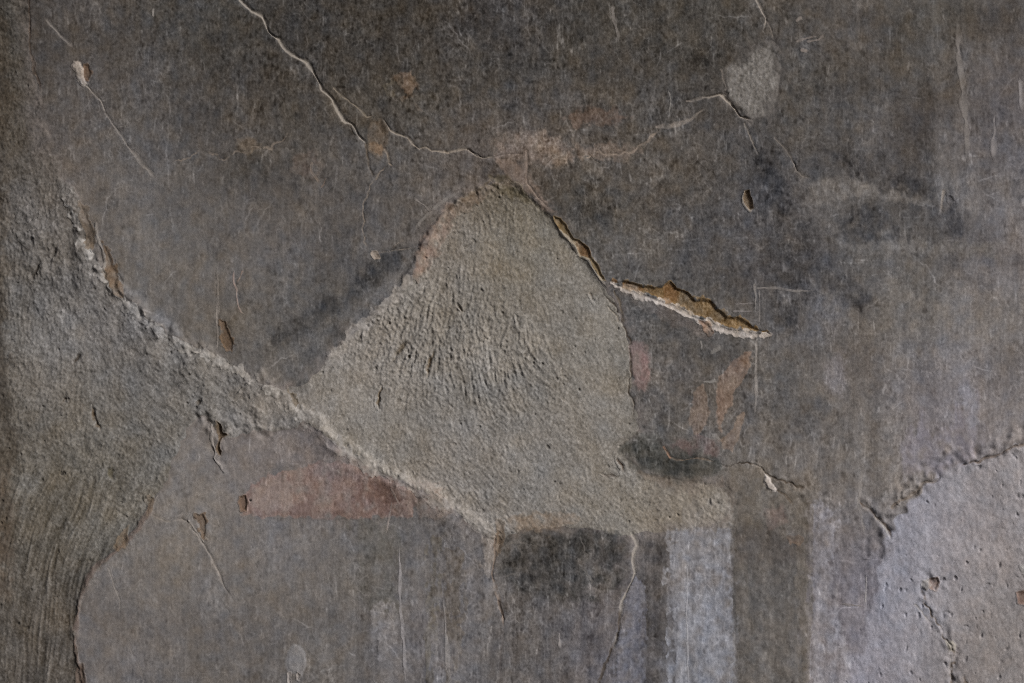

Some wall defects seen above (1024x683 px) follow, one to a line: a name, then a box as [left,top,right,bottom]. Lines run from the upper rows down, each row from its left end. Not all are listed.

crack [238,0,548,252]
peeling [348,240,418,328]
flaking render [552,215,773,343]
crack [597,535,639,683]
flaking render [920,576,941,593]